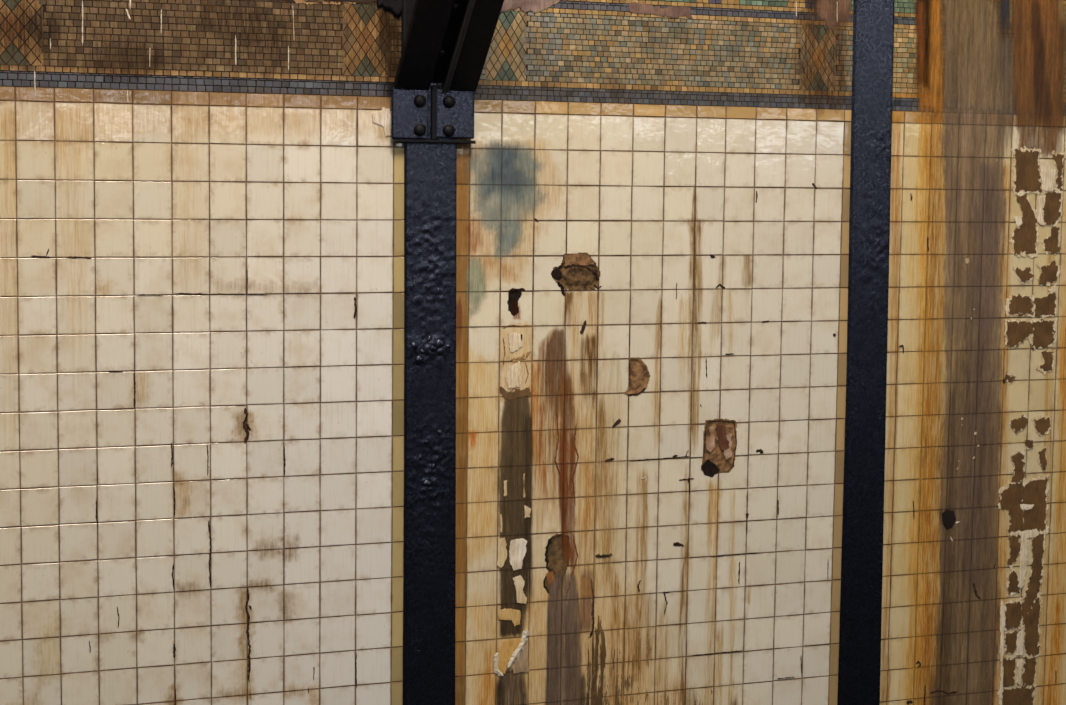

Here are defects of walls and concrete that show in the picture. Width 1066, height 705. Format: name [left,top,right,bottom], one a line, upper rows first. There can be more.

water stain [473,144,539,256]
water stain [469,260,485,310]
spalling [507,288,525,316]
spalling [551,253,601,296]
water stain [580,320,595,373]
water stain [916,0,1066,705]
crack [243,408,251,444]
rust [543,330,579,577]
spalling [701,418,737,477]
crack [244,587,252,682]
peeling [497,514,529,674]
peeling [997,414,1052,705]